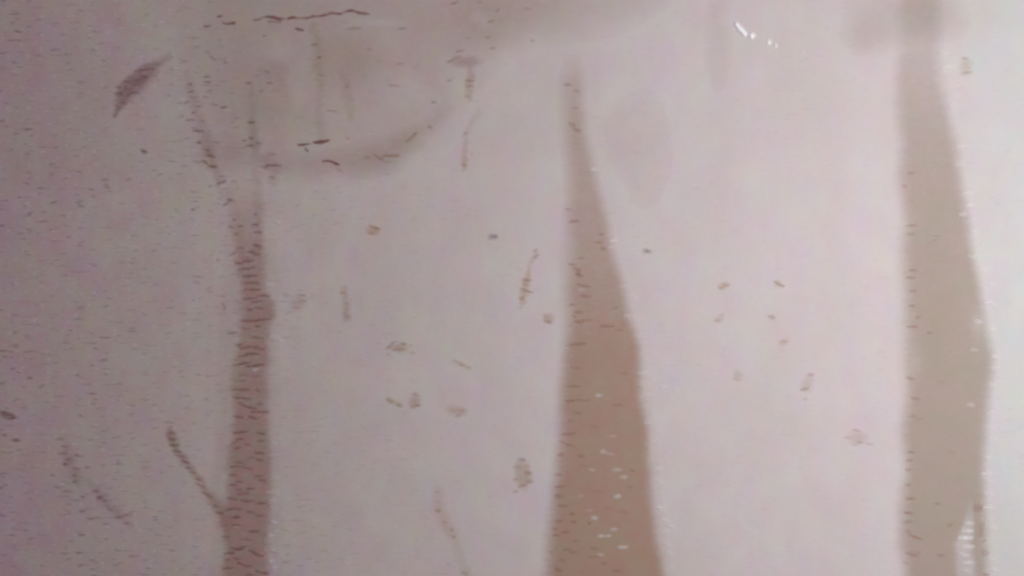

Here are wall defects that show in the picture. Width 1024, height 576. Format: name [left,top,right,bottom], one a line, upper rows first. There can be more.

leakage [908,177,996,576]